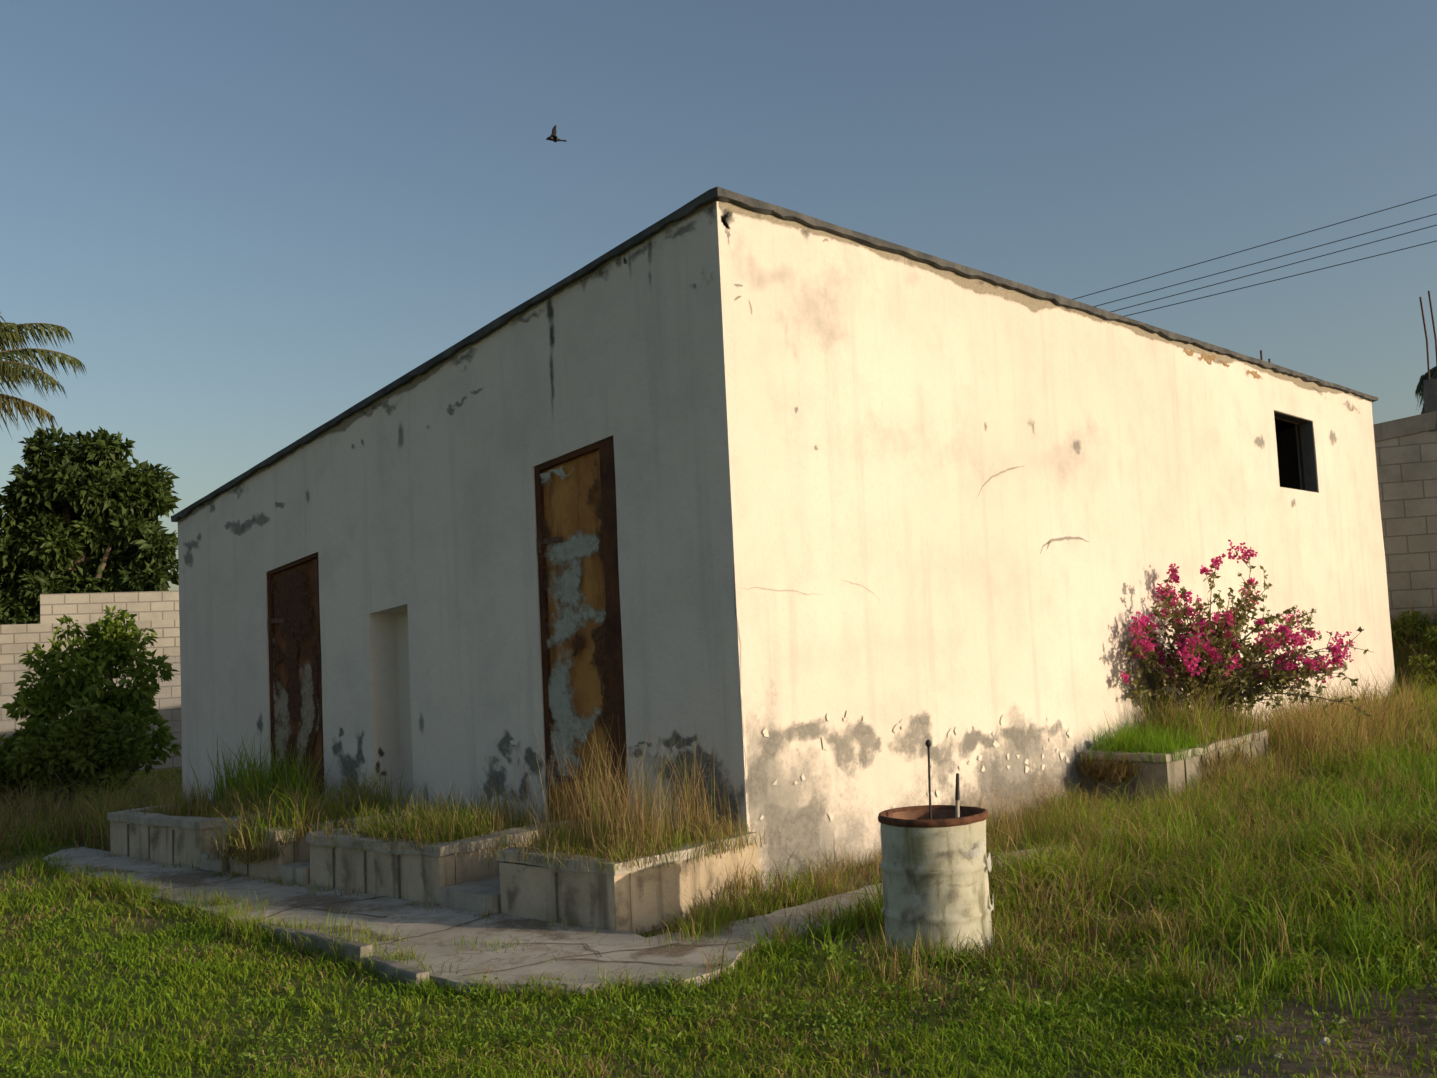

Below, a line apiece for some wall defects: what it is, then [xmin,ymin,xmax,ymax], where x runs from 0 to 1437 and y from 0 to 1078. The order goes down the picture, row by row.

damp [520,300,554,345]
peeling [225,502,284,535]
peeling [179,337,486,522]
peeling [540,466,568,483]
corrosion [271,568,318,776]
damp [332,728,386,796]
damp [481,733,557,806]
peeling [547,533,605,776]
corrosion [571,620,612,771]
damp [633,710,1081,889]